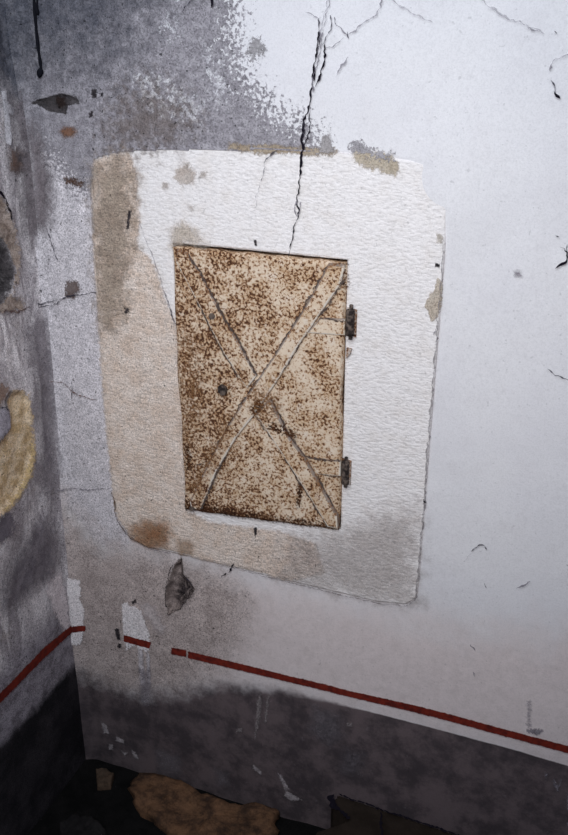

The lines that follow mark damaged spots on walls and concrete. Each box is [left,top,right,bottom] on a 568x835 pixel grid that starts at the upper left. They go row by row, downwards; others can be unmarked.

crack [491,7,557,34]
leakage [245,36,267,62]
crack [549,54,568,98]
leakage [1,91,52,244]
leakage [163,164,205,188]
leakage [228,134,337,156]
crack [288,0,432,257]
leakage [348,139,399,176]
leakage [172,222,201,243]
flaking render [10,0,337,615]
rust [176,329,337,531]